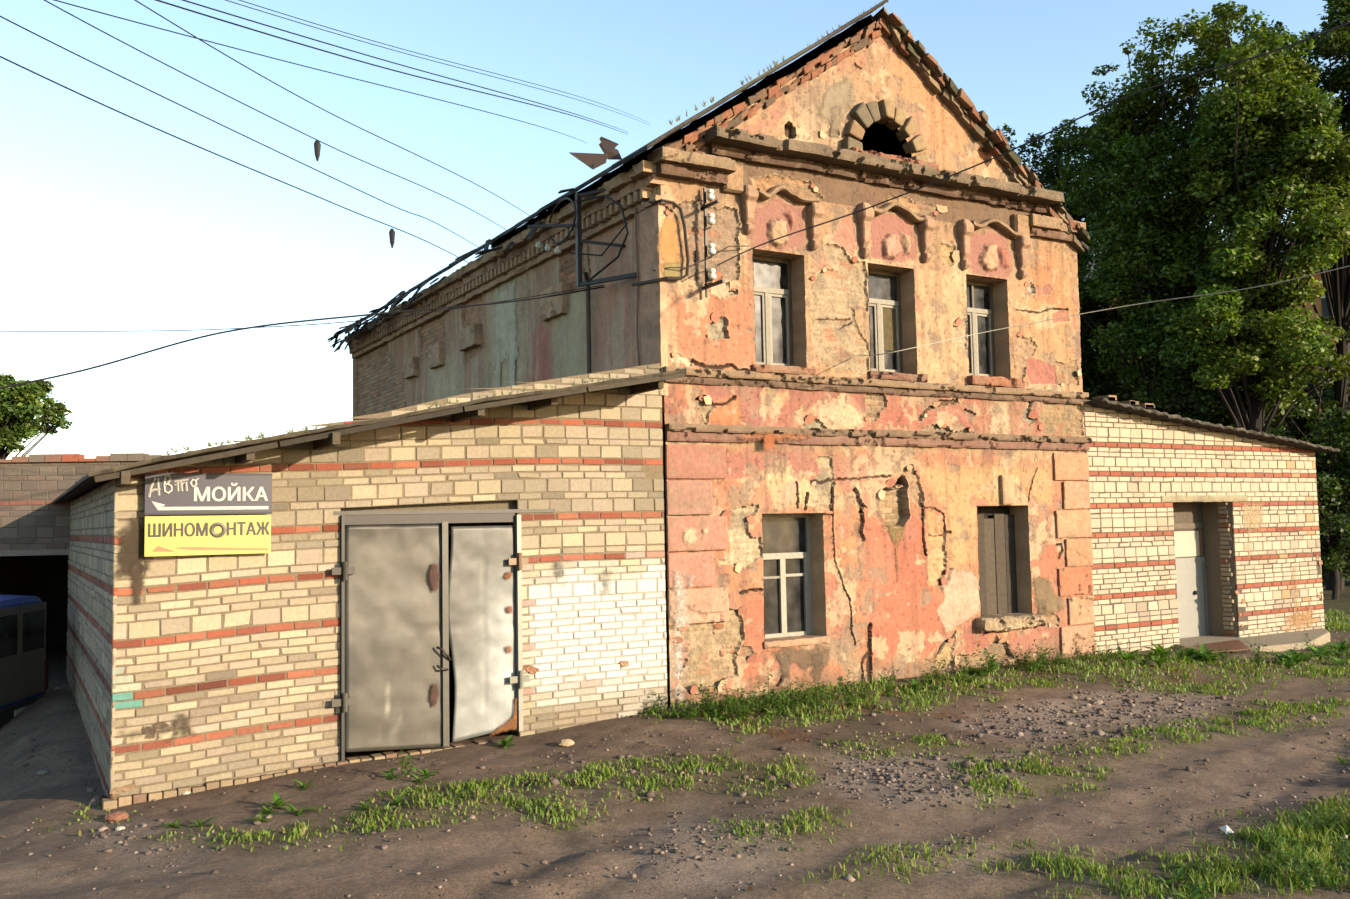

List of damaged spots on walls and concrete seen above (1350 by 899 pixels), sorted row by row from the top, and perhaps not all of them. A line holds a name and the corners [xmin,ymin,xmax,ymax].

spalling [662,199,741,340]
spalling [809,216,870,372]
spalling [355,344,407,420]
spalling [698,395,716,424]
spalling [918,398,974,433]
spalling [1014,332,1084,436]
spalling [807,455,836,512]
spalling [852,464,925,527]
spalling [717,503,763,573]
spalling [672,573,757,700]
peeling [926,534,1015,670]
corrosion [492,698,518,735]